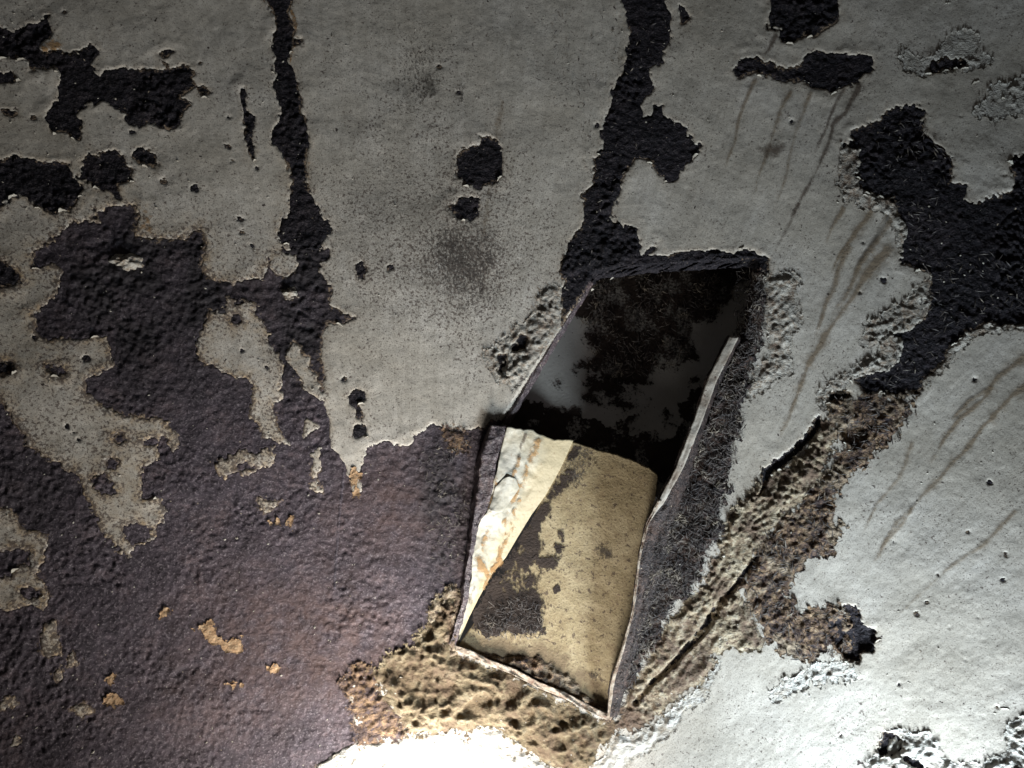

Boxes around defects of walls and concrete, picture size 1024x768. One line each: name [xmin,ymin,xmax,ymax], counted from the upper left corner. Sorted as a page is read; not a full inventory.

peeling [835,142,908,256]
peeling [482,284,565,393]
peeling [815,268,932,411]
peeling [923,322,1024,389]
peeling [438,421,473,457]
peeling [488,476,519,513]
peeling [315,726,553,768]
peeling [593,659,722,768]